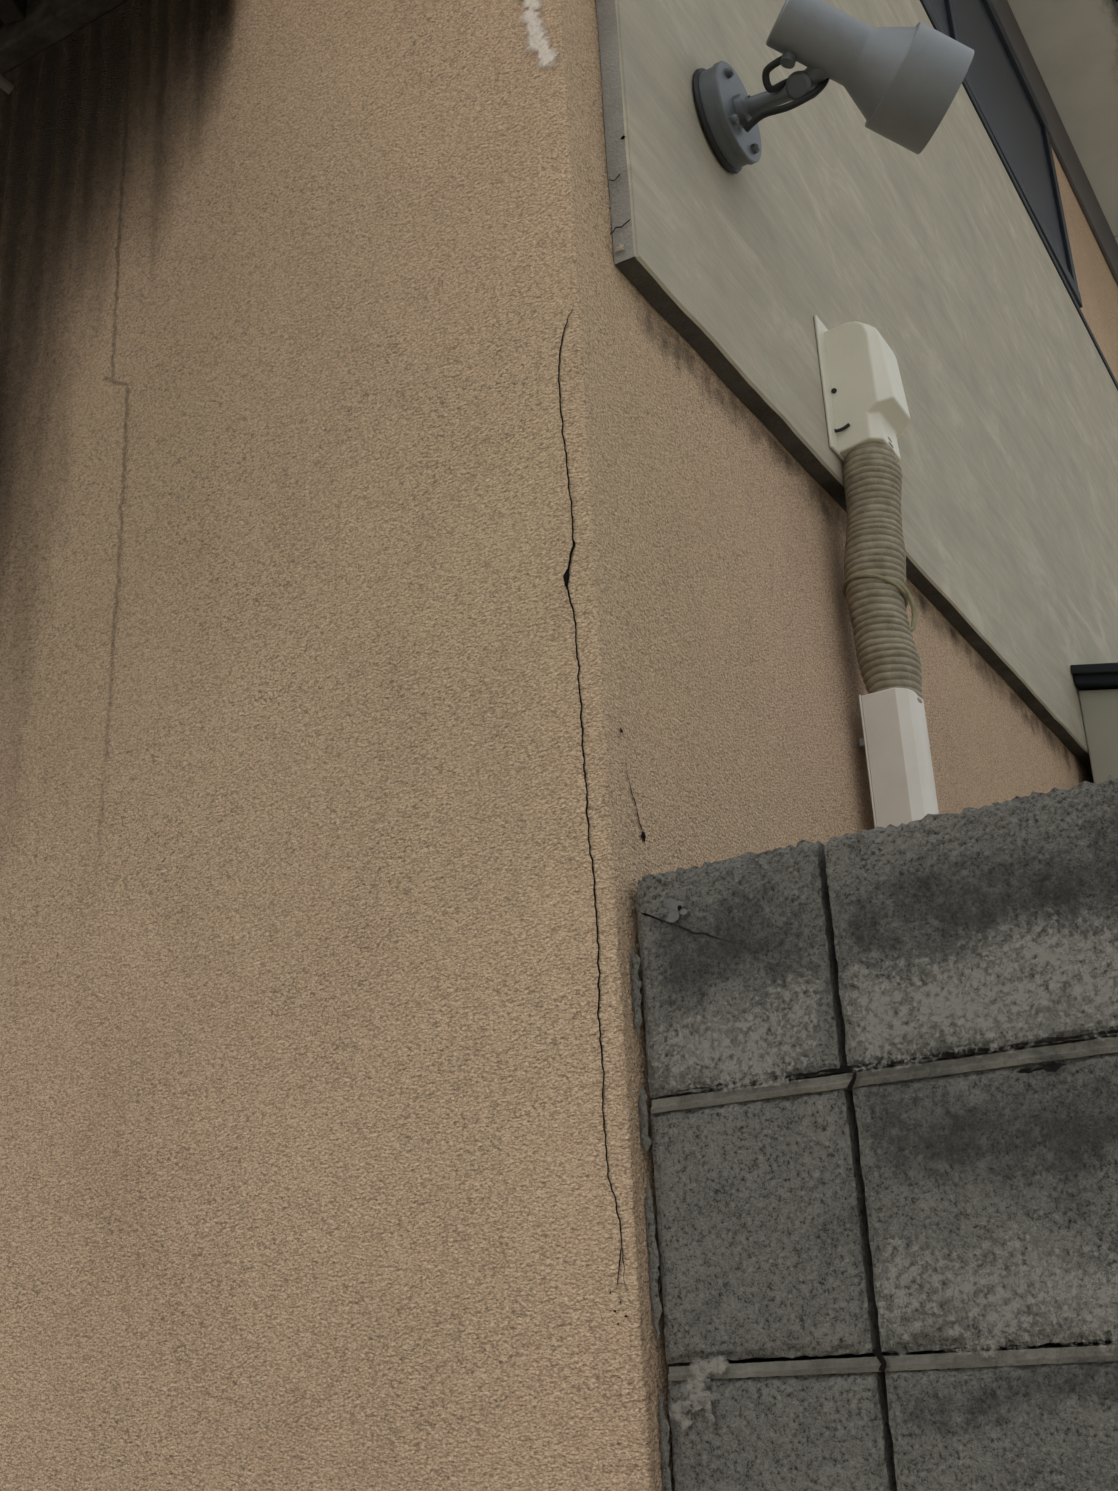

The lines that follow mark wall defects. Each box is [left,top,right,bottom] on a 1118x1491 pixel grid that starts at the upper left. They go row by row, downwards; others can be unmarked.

crack [521,0,559,67]
damp [0,0,230,374]
crack [558,302,630,1325]
crack [620,728,646,842]
crack [640,912,721,940]